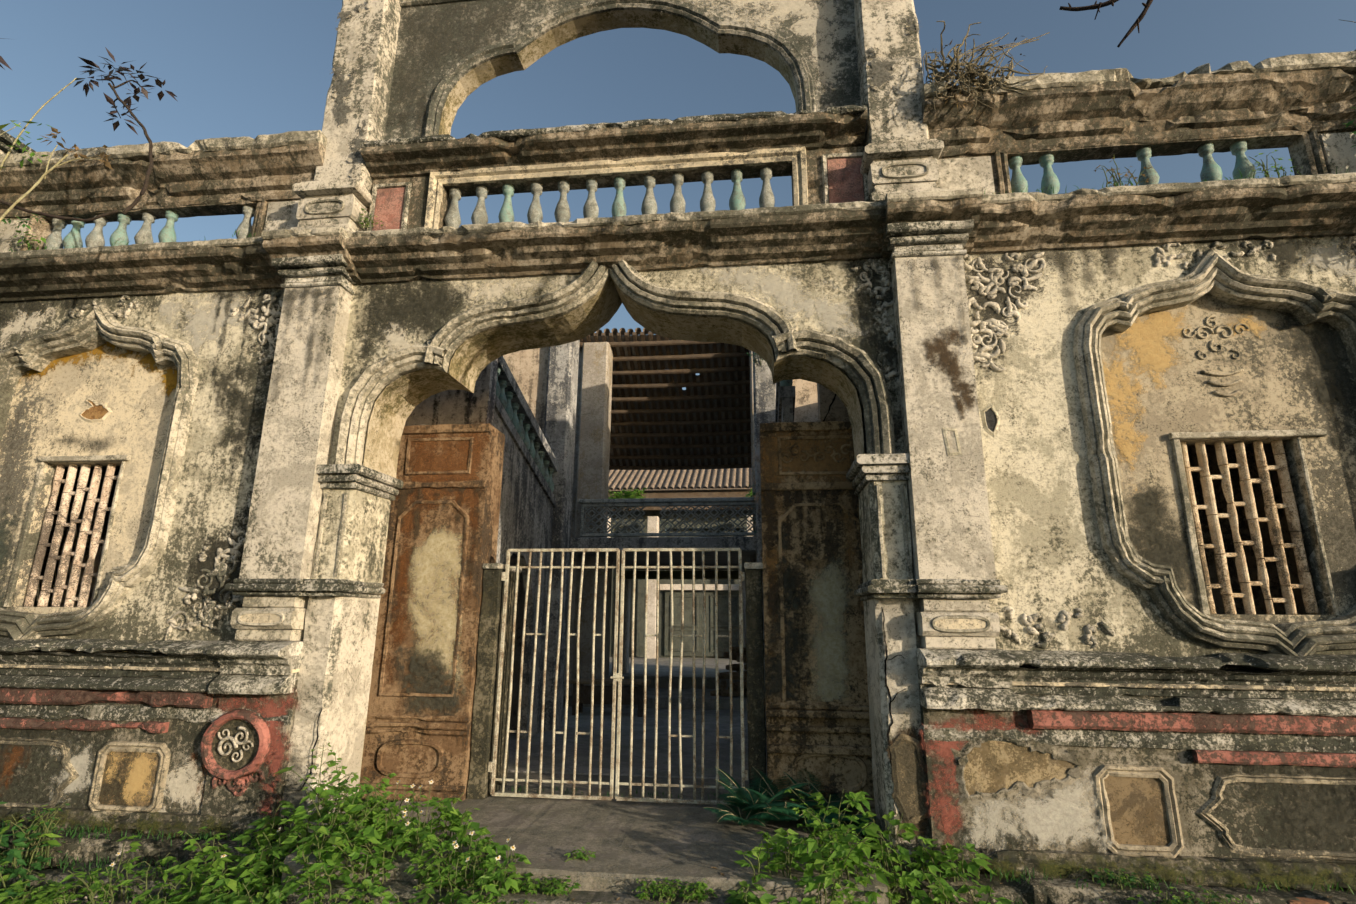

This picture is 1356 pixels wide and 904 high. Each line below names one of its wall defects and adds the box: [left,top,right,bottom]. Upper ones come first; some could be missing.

leakage [389,0,521,131]
leakage [0,298,90,349]
leakage [25,341,177,405]
peeling [923,326,1000,456]
peeling [1102,311,1188,470]
leakage [1123,482,1210,610]
crack [286,709,322,792]
crack [881,607,905,767]
spalling [889,708,1088,845]